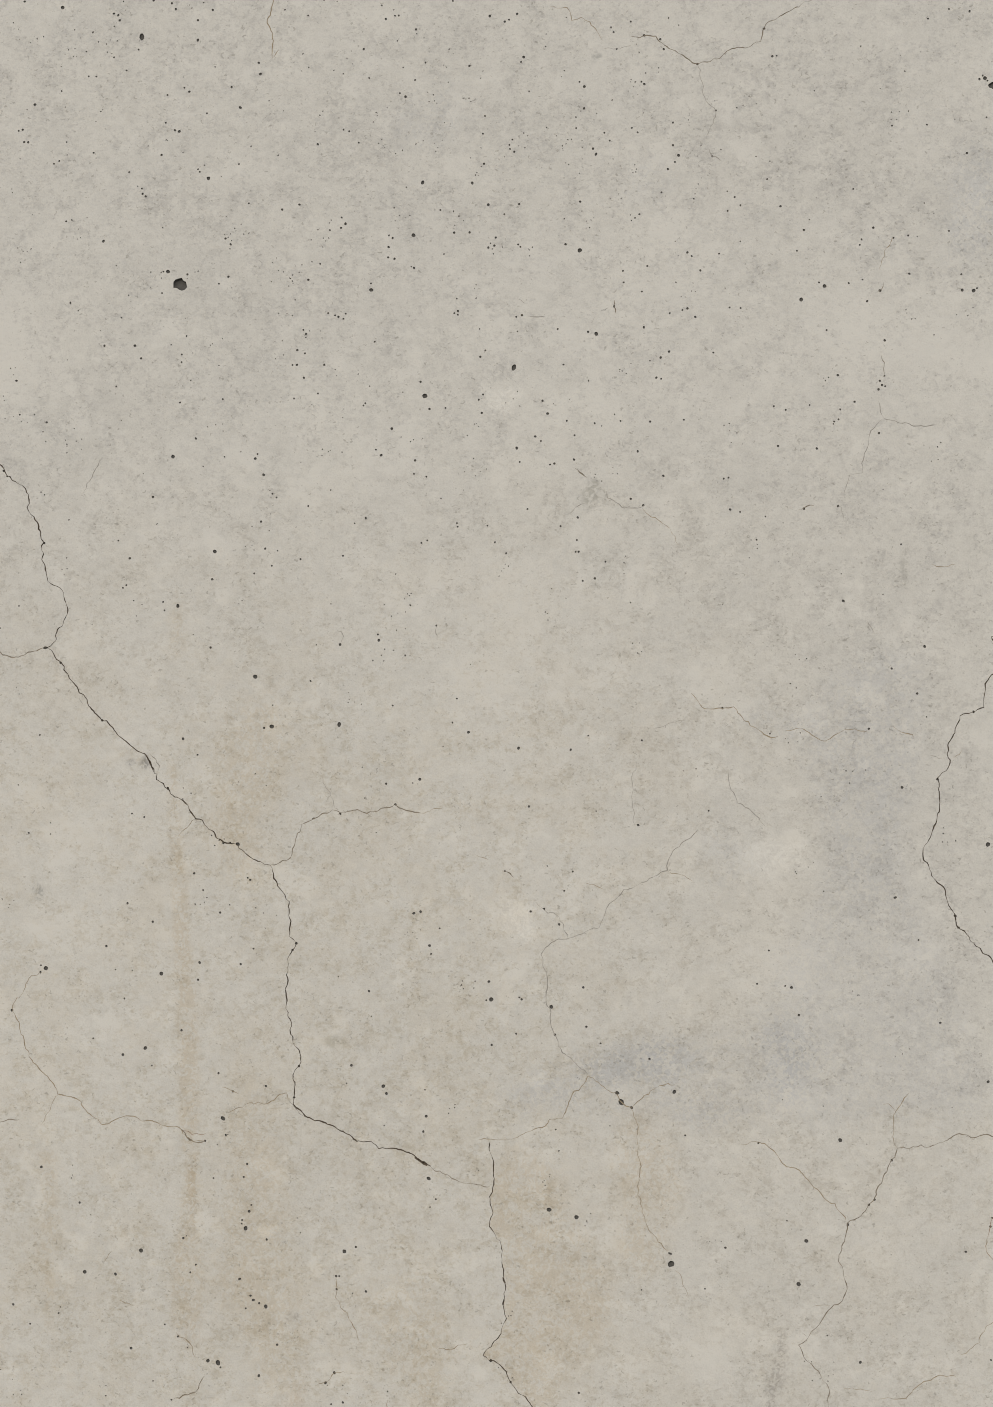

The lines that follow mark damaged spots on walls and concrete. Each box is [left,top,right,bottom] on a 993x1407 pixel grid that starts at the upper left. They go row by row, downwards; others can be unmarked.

crack [799,359,933,518]
crack [0,464,697,1407]
crack [631,674,993,962]
crack [746,1093,993,1401]